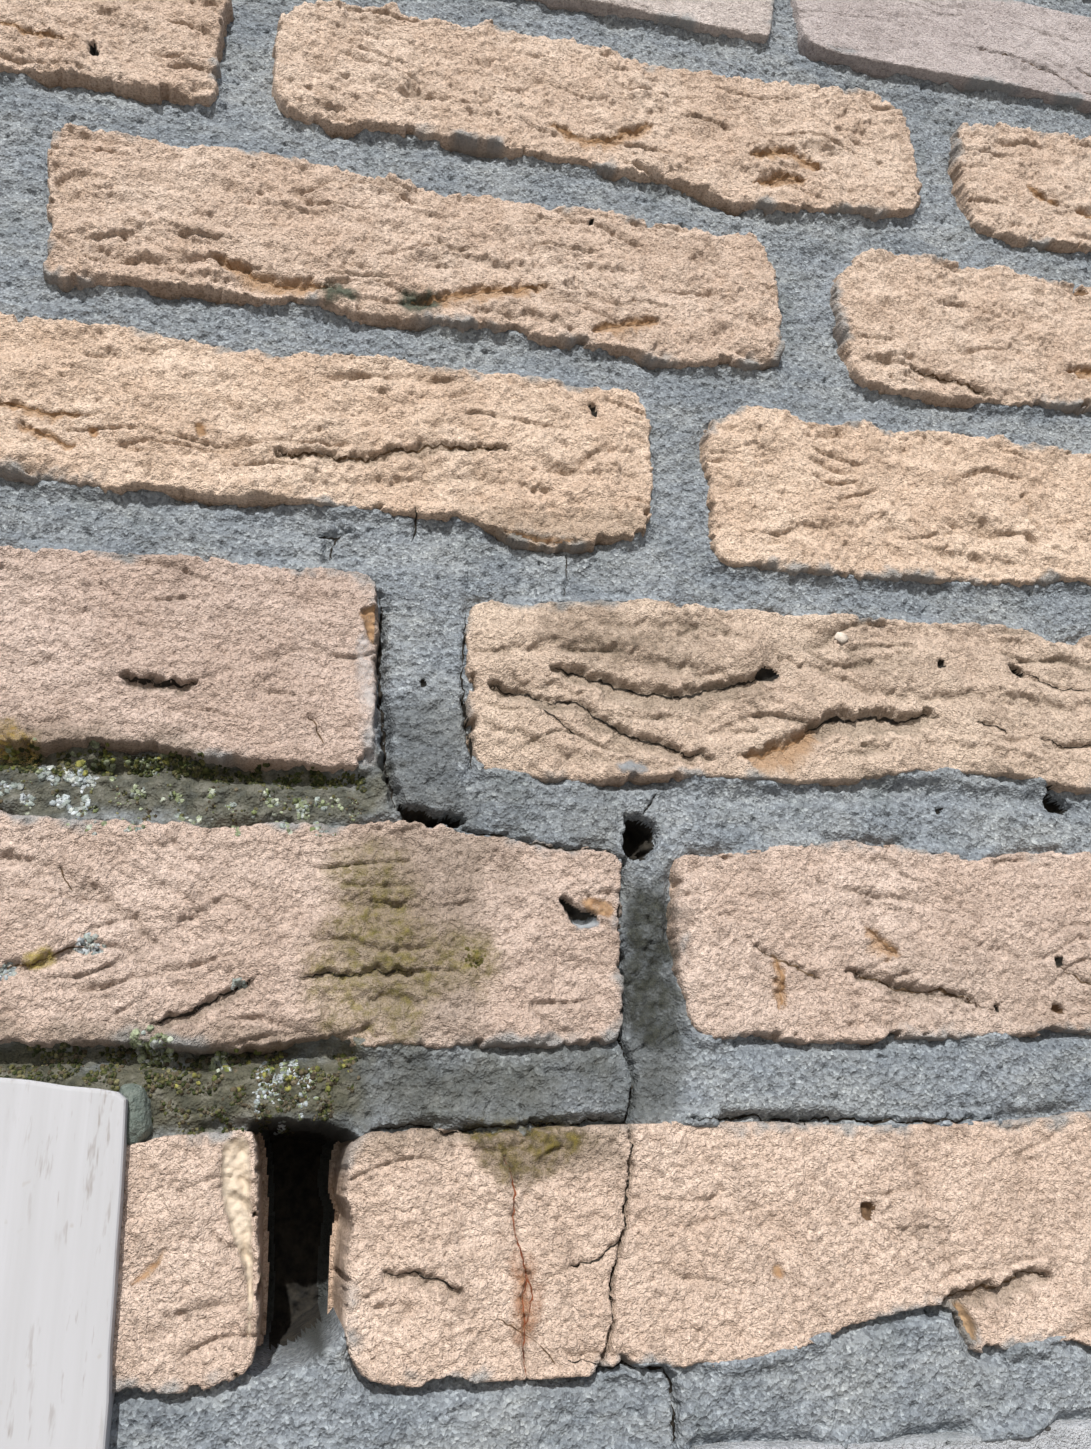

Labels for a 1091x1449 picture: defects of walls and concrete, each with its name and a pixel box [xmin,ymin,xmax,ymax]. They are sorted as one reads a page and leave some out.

crack [462,830,620,859]
crack [372,1033,676,1449]